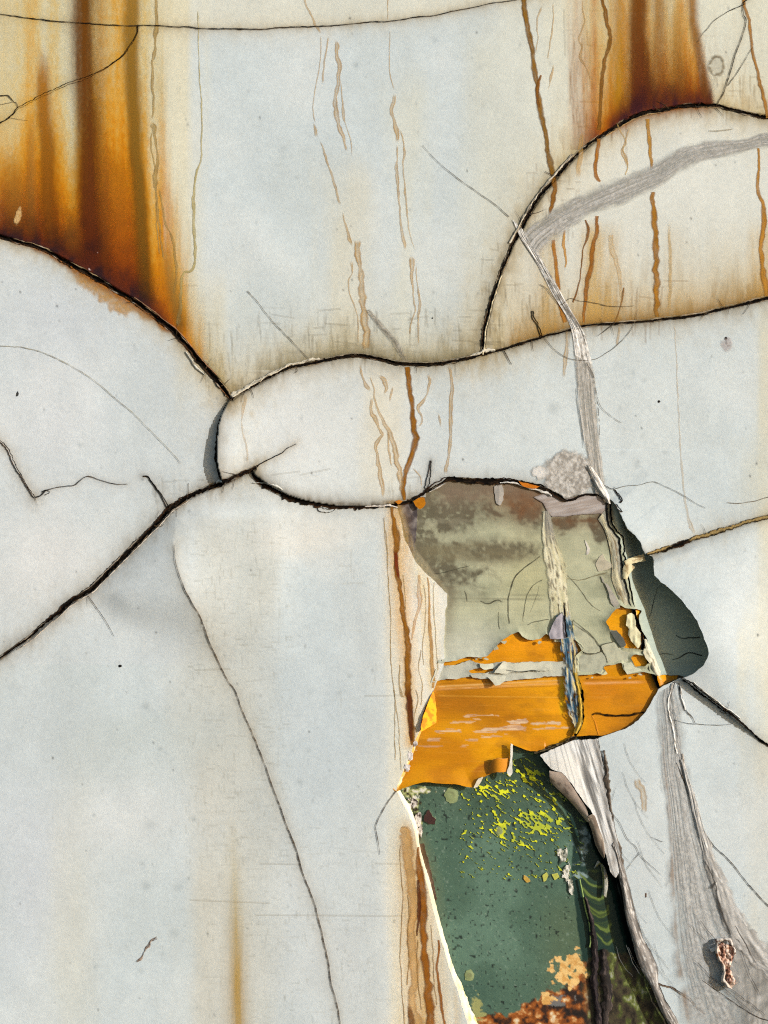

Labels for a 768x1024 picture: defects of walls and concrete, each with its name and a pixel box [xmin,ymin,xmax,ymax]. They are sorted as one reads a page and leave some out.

rust [0,0,203,360]
rust [306,7,352,149]
rust [344,220,370,345]
crack [0,0,768,659]
rust [389,71,413,244]
rust [558,216,599,323]
rust [579,0,712,182]
rust [650,192,670,317]
rust [360,367,438,770]
crack [174,548,341,1024]
peeling [393,477,709,1024]
rust [400,827,446,1024]